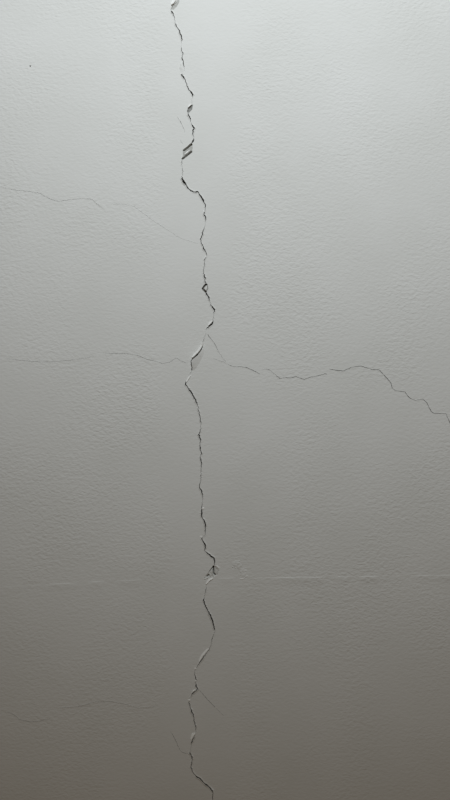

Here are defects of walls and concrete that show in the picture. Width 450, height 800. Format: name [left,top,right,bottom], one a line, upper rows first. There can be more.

crack [2,10,450,424]
crack [4,352,216,566]
crack [170,586,224,800]